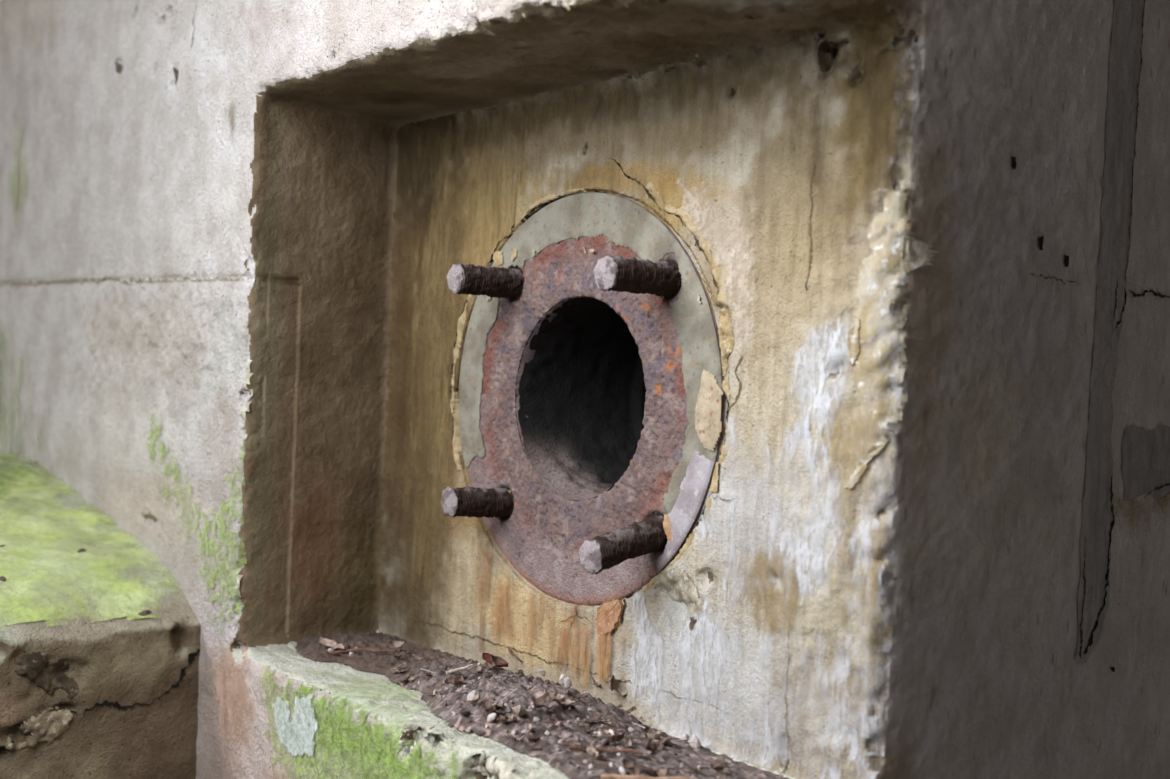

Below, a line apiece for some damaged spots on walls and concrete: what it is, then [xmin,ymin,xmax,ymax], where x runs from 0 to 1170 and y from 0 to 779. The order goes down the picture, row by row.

crack [1112,0,1169,330]
damp [412,226,448,475]
damp [699,515,711,539]
damp [751,318,893,779]
spalling [5,651,79,750]
crack [68,649,200,715]
rust [559,597,624,681]
damp [631,593,663,718]
damp [677,602,738,747]
damp [730,713,787,766]